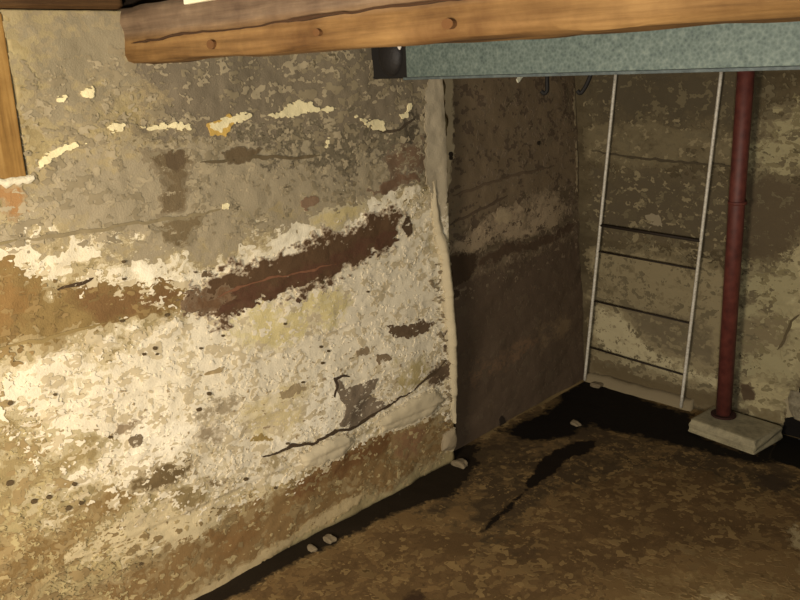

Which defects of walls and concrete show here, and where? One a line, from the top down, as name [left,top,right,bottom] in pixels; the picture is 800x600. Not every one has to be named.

peeling [80,86,95,98]
peeling [107,123,126,133]
peeling [140,122,192,131]
peeling [210,112,252,133]
peeling [38,142,87,168]
leakage [579,75,614,232]
spalling [187,342,412,455]
crack [262,359,447,457]
leakage [339,404,401,453]
leakage [754,462,800,506]
leakage [572,520,800,600]